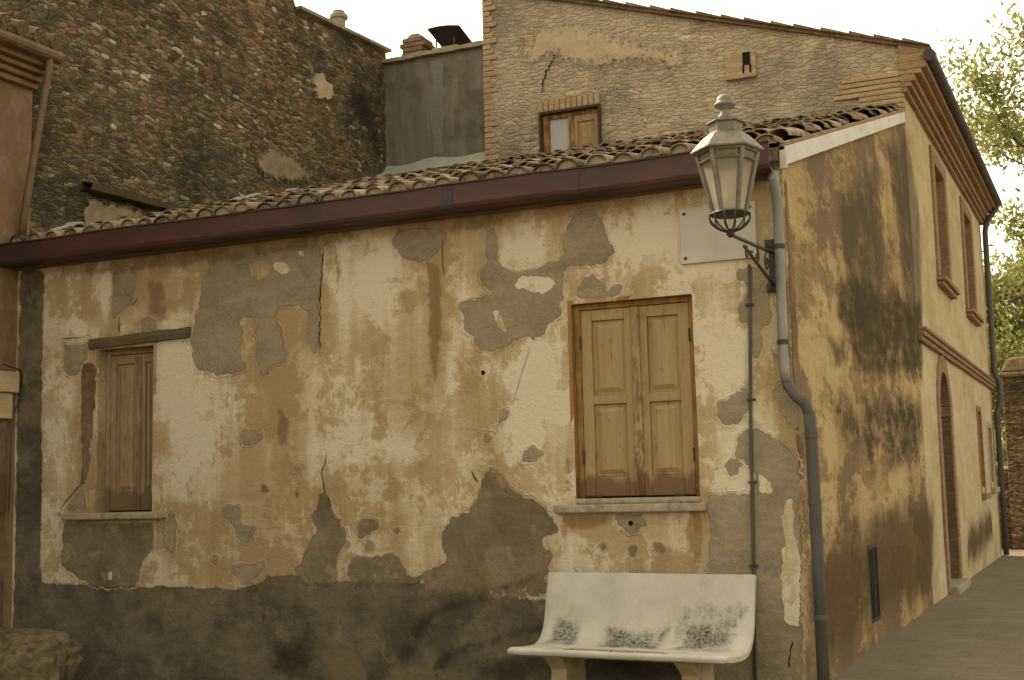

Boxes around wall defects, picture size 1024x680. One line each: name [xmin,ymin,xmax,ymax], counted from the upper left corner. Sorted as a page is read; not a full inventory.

crack [541,54,556,94]
peeling [188,242,326,380]
peeling [392,228,446,263]
peeling [456,205,624,356]
water stain [839,284,922,378]
spalling [61,340,100,487]
peeling [703,176,809,680]
spalling [58,519,157,591]
peeling [295,465,561,605]
water stain [551,623,659,674]